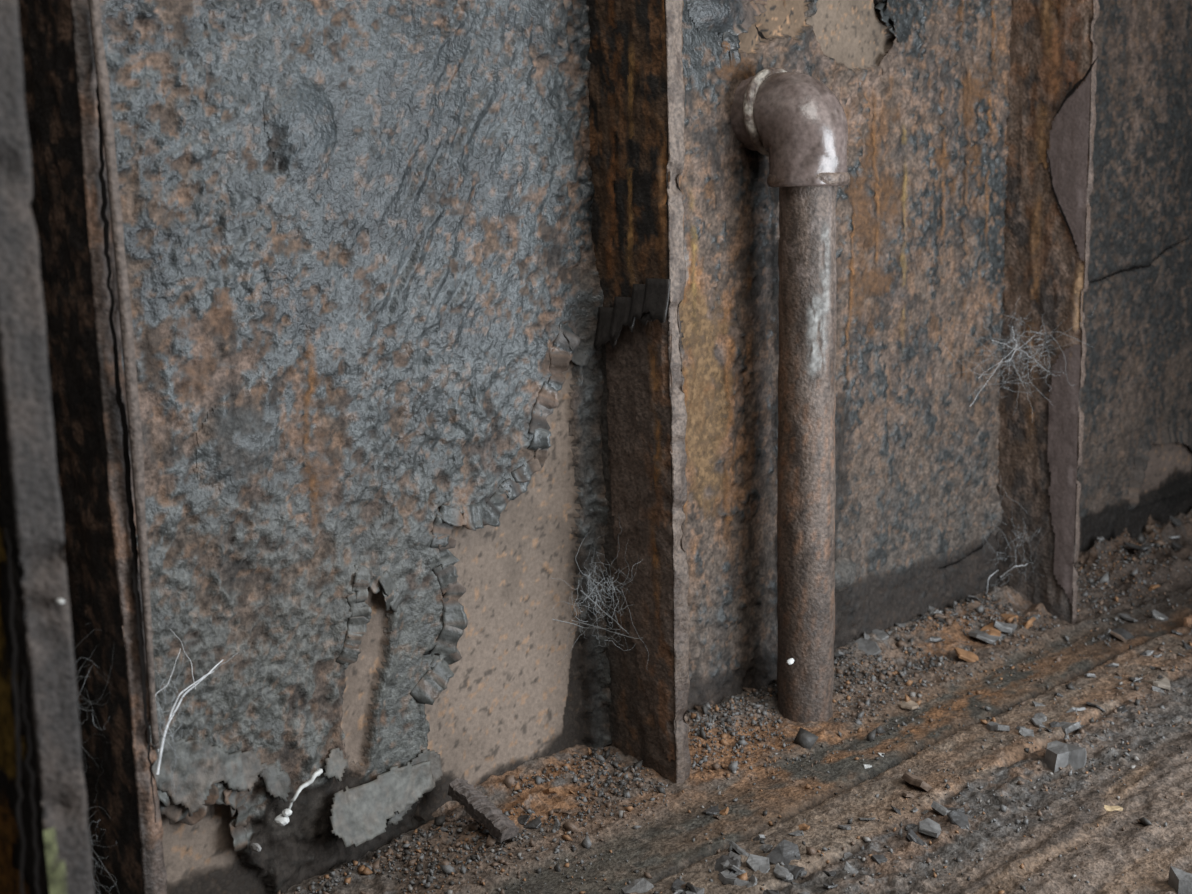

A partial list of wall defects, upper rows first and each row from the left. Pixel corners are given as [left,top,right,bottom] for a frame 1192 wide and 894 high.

peeling [721,0,903,75]
crack [1052,57,1098,119]
corrosion [608,133,633,270]
corrosion [659,141,668,247]
corrosion [1031,197,1042,300]
peeling [1047,71,1091,261]
corrosion [1074,266,1084,330]
crack [1046,150,1188,283]
corrosion [679,282,732,525]
peeling [1048,344,1081,603]
peeling [1128,423,1192,511]
peeling [323,278,676,848]